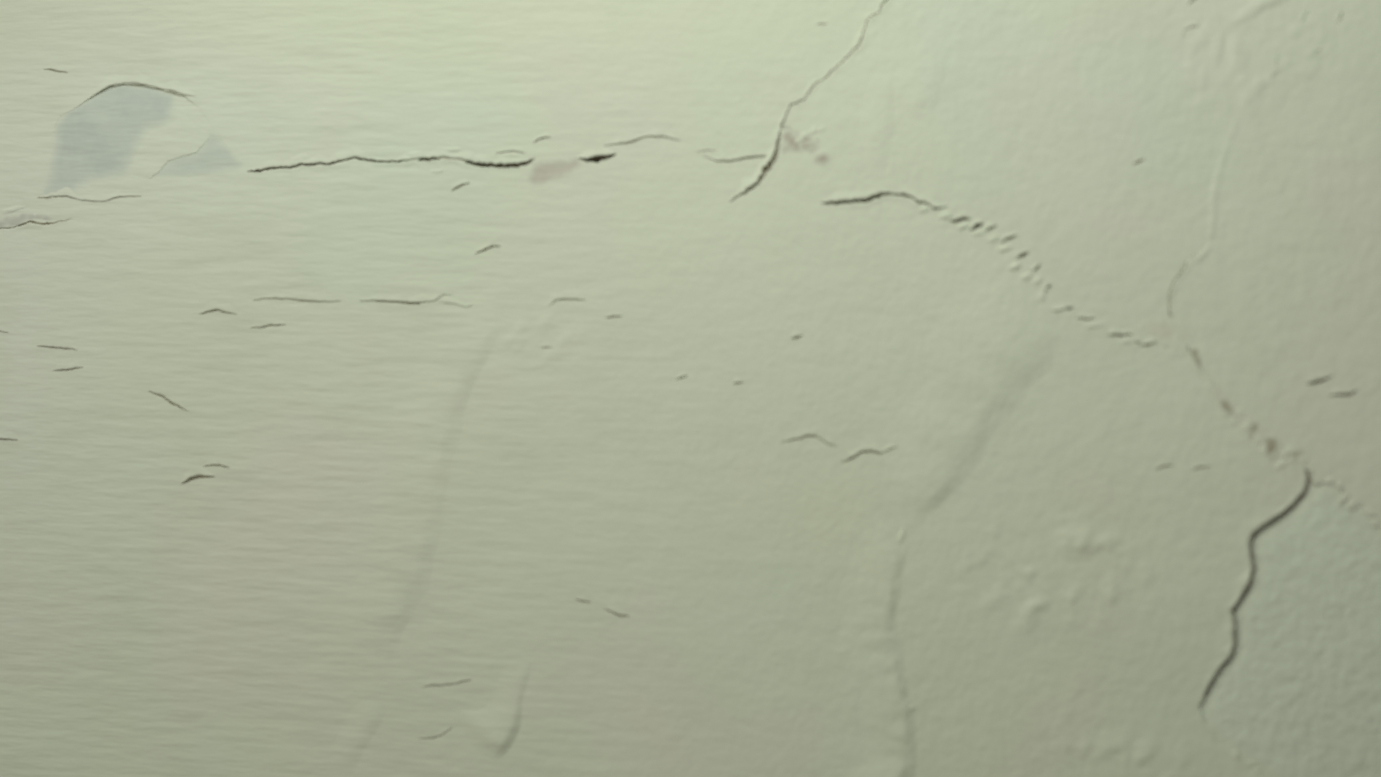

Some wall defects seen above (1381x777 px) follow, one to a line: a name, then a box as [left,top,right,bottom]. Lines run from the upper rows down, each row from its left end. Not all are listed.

crack [575,0,892,202]
peeling [42,70,245,197]
crack [247,146,535,175]
crack [0,187,141,237]
crack [253,289,473,307]
crack [780,427,898,463]
crack [821,186,1312,706]